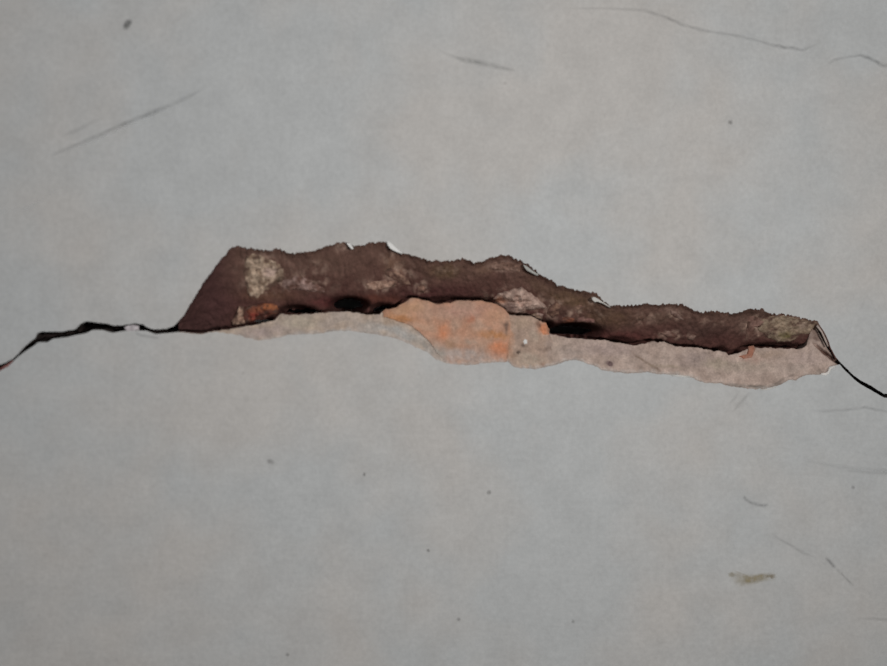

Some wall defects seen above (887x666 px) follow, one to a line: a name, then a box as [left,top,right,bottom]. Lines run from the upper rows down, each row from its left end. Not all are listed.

spalling [178,241,838,390]
crack [0,321,179,371]
crack [835,360,887,398]